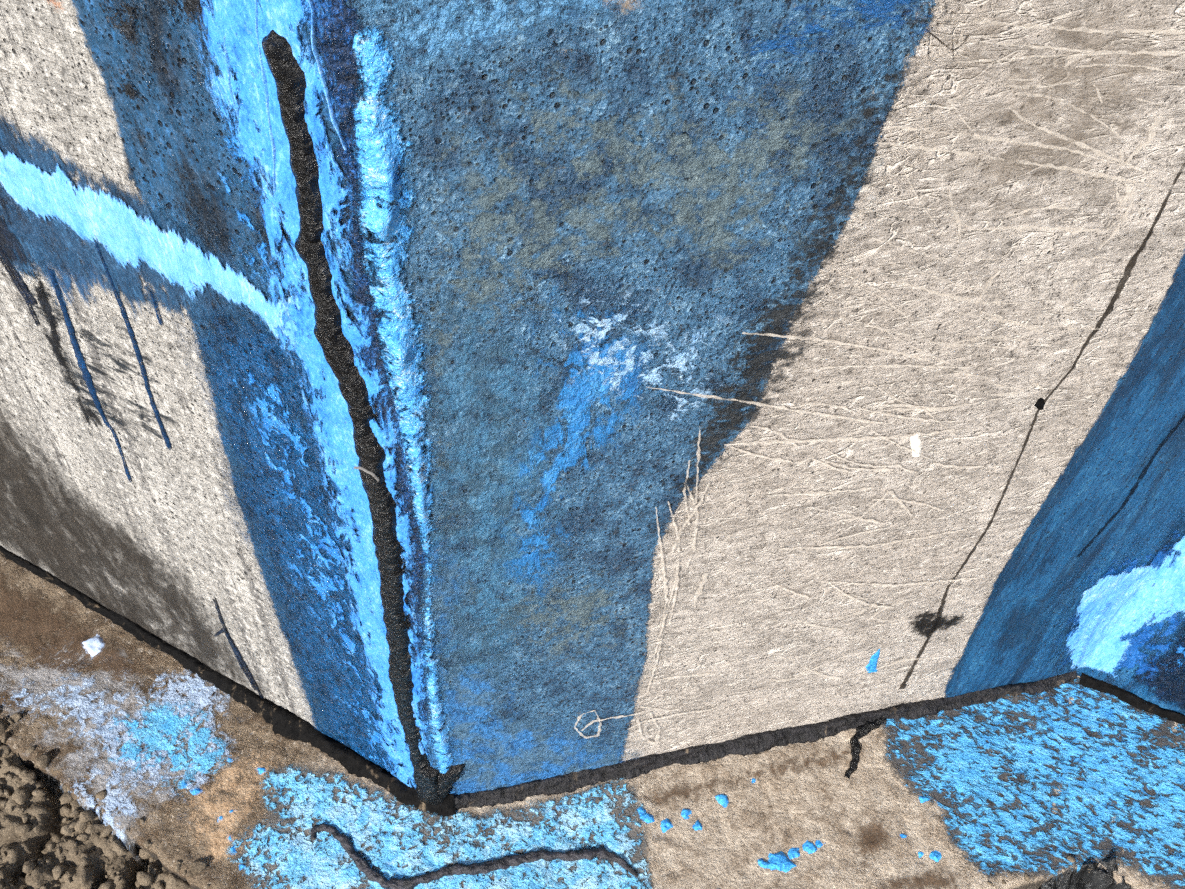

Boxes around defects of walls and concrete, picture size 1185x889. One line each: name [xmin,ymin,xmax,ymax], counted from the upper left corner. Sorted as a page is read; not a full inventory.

crack [925,28,967,51]
crack [898,163,1185,690]
crack [310,823,639,889]